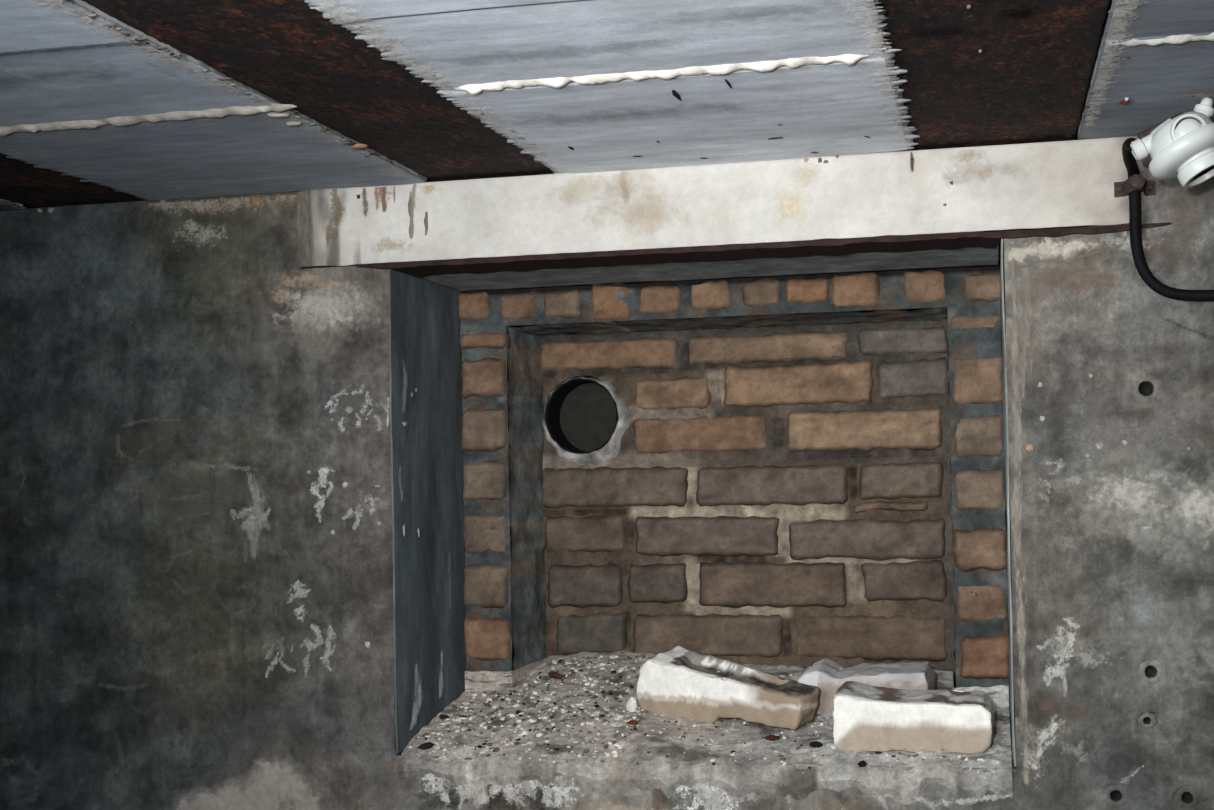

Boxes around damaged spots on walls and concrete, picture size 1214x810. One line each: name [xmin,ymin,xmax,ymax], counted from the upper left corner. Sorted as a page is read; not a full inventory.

corrosion [267,112,302,126]
damp [325,362,418,432]
damp [206,463,274,563]
damp [307,467,381,535]
damp [1091,471,1214,541]
damp [265,580,335,678]
damp [410,664,422,729]